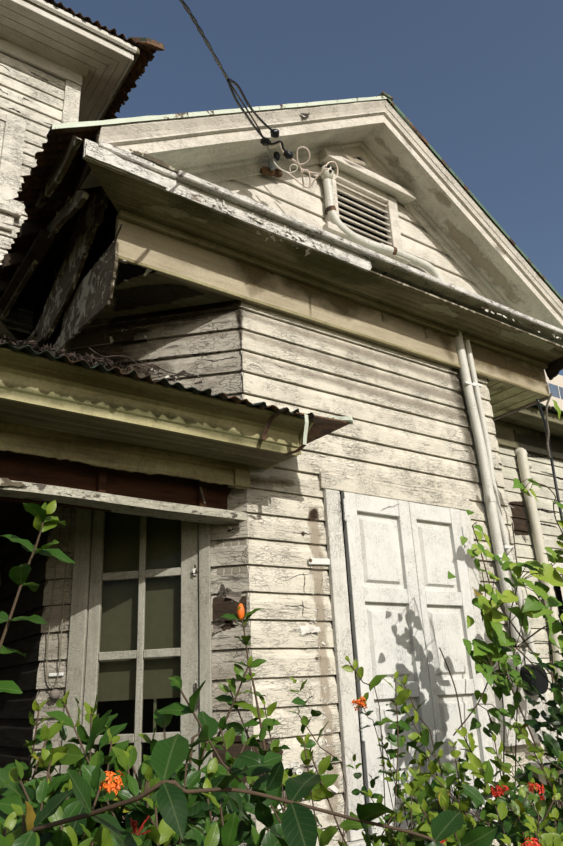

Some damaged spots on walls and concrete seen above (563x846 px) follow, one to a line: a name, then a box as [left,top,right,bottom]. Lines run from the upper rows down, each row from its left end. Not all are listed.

damp [176,202,235,224]
damp [234,259,273,286]
damp [286,278,370,315]
damp [292,247,380,284]
damp [446,221,518,302]
damp [68,284,478,487]
damp [0,384,282,448]
peeling [212,584,248,634]